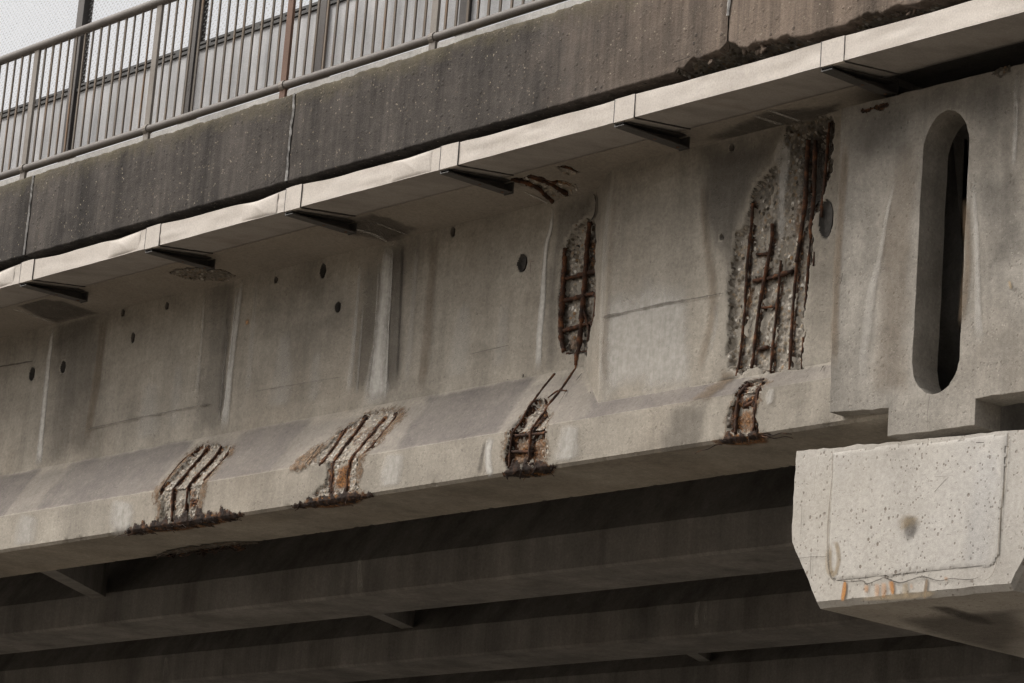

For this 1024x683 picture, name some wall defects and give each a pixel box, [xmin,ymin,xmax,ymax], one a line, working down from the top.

spalling [676,38,818,79]
spalling [856,3,946,32]
spalling [511,165,580,204]
spalling [695,115,835,454]
spalling [500,218,597,480]
spalling [115,442,245,538]
spalling [291,405,406,511]